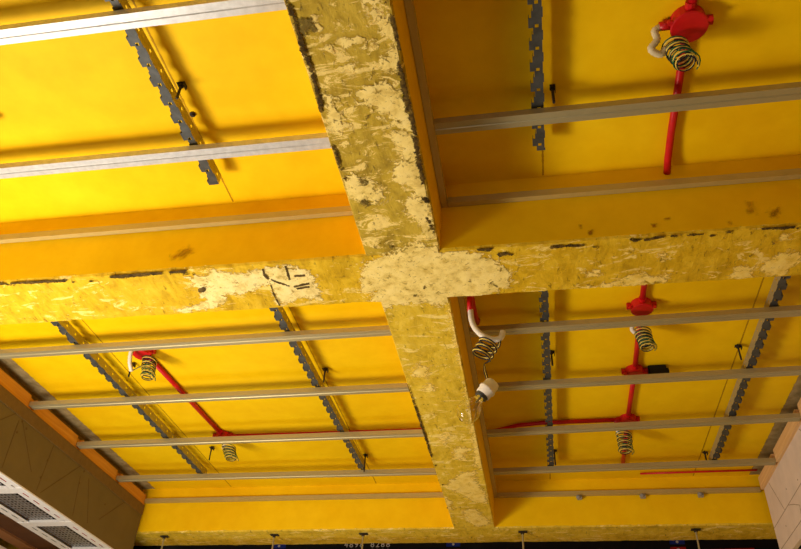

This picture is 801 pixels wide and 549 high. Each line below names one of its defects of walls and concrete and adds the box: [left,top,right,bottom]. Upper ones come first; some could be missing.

peeling [109,265,323,313]
peeling [285,0,518,370]